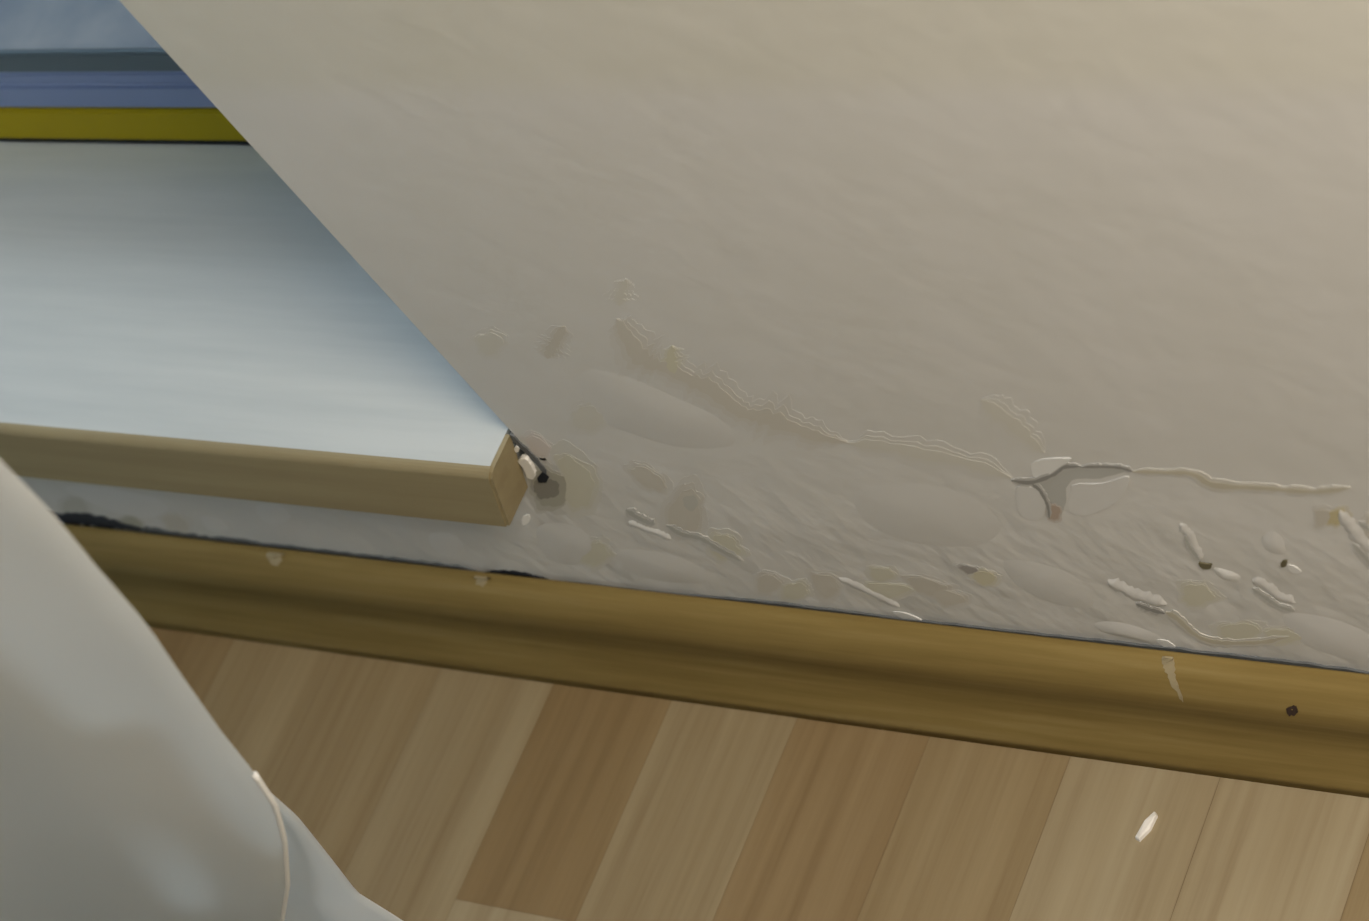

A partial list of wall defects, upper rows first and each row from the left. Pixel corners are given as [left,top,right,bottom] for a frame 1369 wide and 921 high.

peeling [1016,457,1125,520]
crack [1011,462,1351,519]
crack [52,508,1369,674]
peeling [1156,639,1175,648]